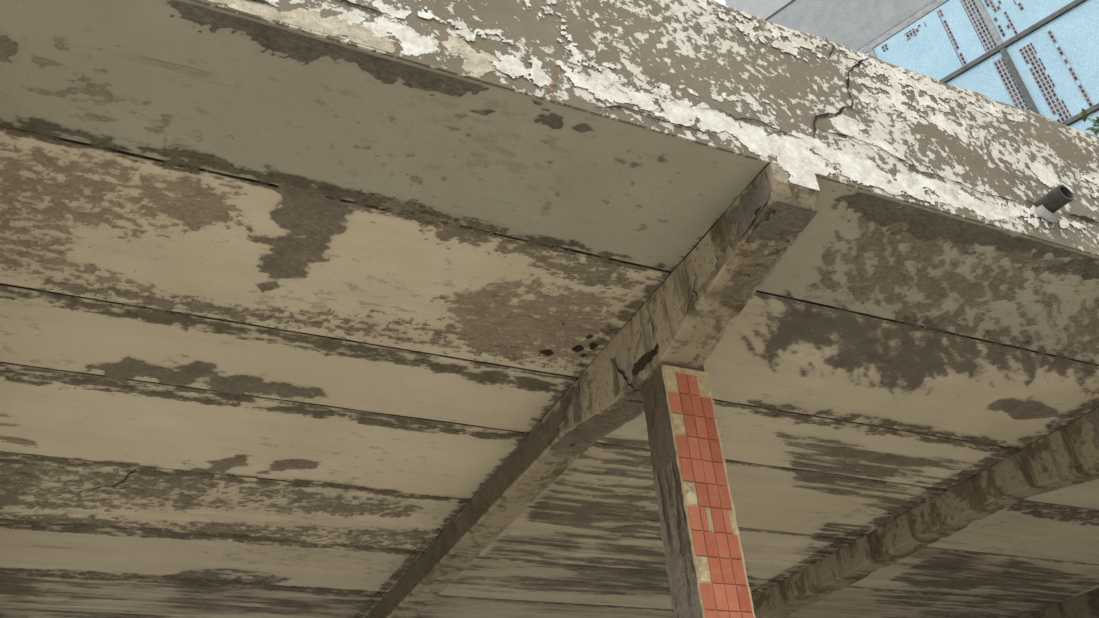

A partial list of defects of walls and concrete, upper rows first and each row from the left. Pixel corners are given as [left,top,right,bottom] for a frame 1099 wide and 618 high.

peeling [0,31,18,63]
peeling [29,70,150,122]
peeling [0,135,663,376]
peeling [167,0,1099,358]
crack [596,38,1036,205]
crack [1061,210,1099,224]
damp [0,118,703,618]
crack [610,310,666,435]
peeling [673,413,686,435]